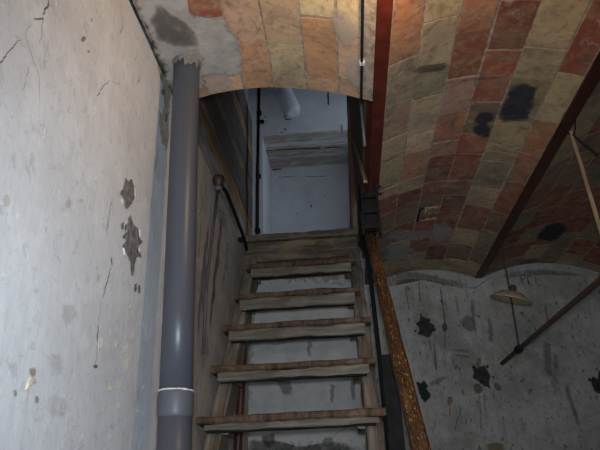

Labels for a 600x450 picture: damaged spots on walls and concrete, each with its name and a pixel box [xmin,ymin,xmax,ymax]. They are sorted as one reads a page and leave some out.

damp [153,9,194,45]
spalling [121,179,143,275]
flaking render [414,313,436,337]
flaking render [416,381,431,402]
flaking render [472,358,501,393]
flaking render [588,371,600,394]